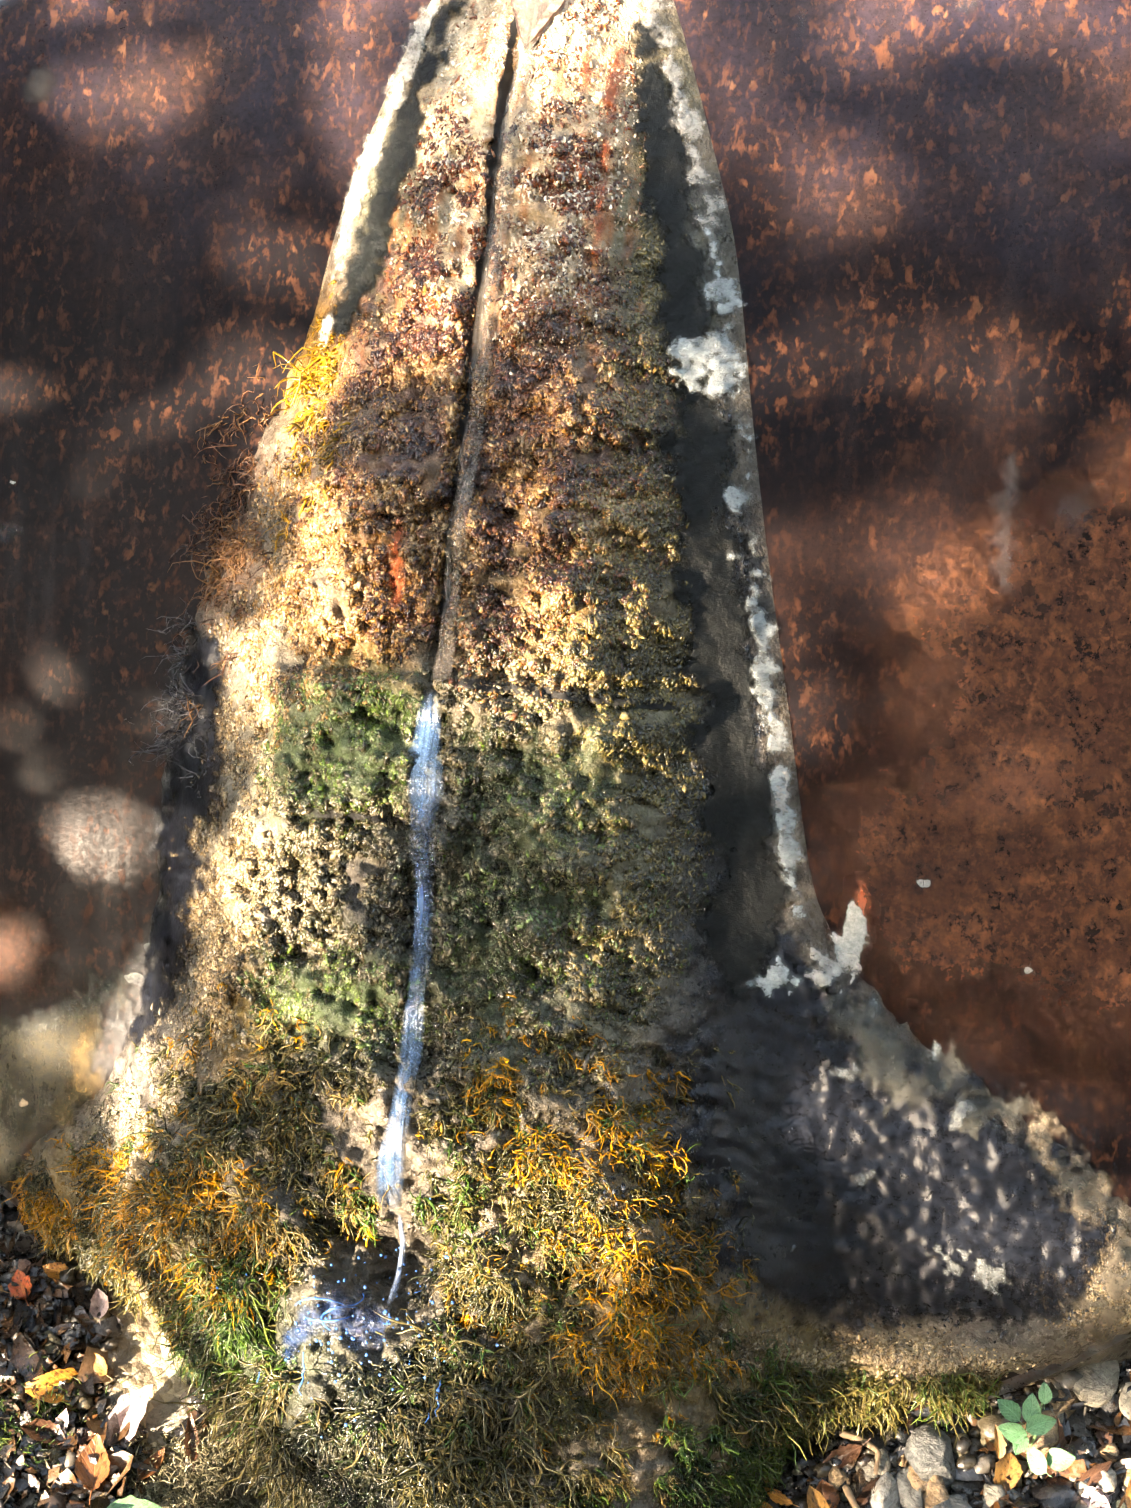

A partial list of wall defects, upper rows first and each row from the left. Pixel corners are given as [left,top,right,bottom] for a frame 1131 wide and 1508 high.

rust [581,45,590,87]
rust [592,48,624,242]
damp [387,366,463,434]
rust [814,449,1131,1096]
damp [286,890,310,938]
damp [119,1226,270,1338]
damp [337,1417,379,1478]
damp [342,1482,410,1508]